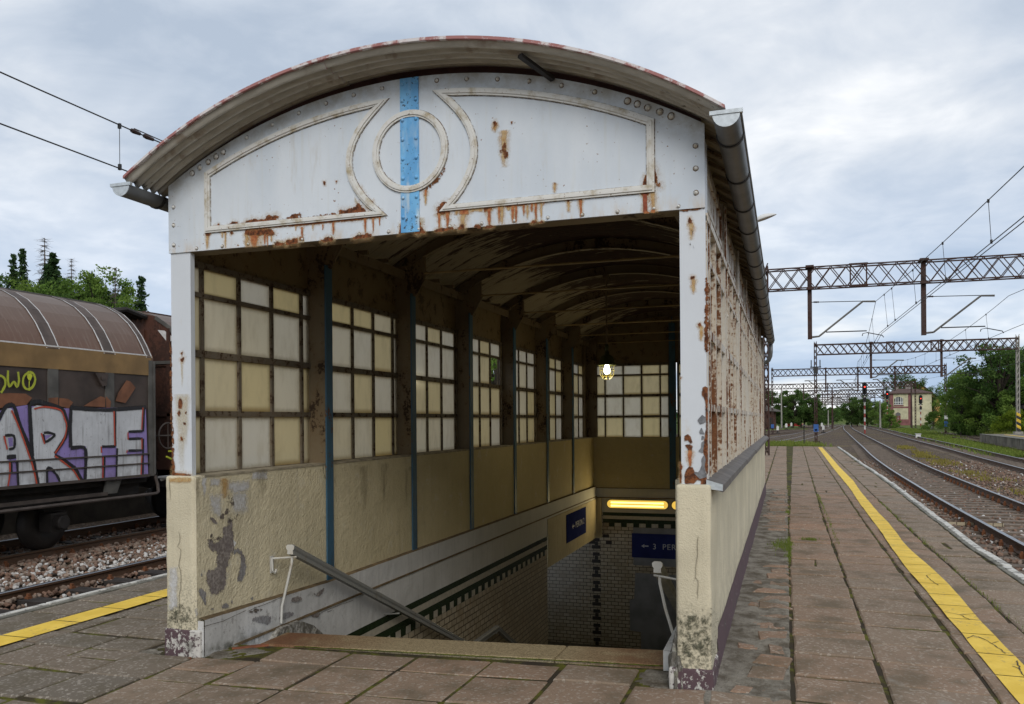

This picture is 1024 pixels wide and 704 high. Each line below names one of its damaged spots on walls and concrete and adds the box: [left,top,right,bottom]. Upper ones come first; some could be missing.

corrosion [493,121,513,159]
corrosion [640,170,661,213]
corrosion [205,201,381,247]
corrosion [169,345,191,482]
peeling [684,386,708,484]
flaking render [195,496,247,615]
crack [692,538,700,594]